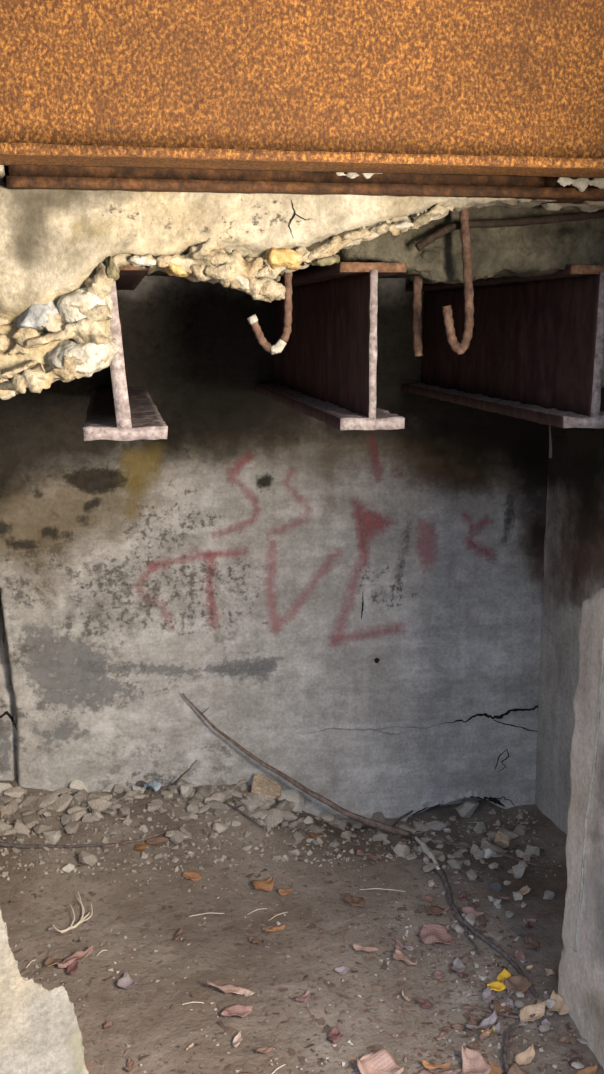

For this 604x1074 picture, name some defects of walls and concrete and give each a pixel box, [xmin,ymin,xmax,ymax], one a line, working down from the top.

crack [289,199,309,236]
spalling [0,203,604,396]
water stain [0,448,216,553]
crack [0,711,17,729]
crack [307,706,538,807]